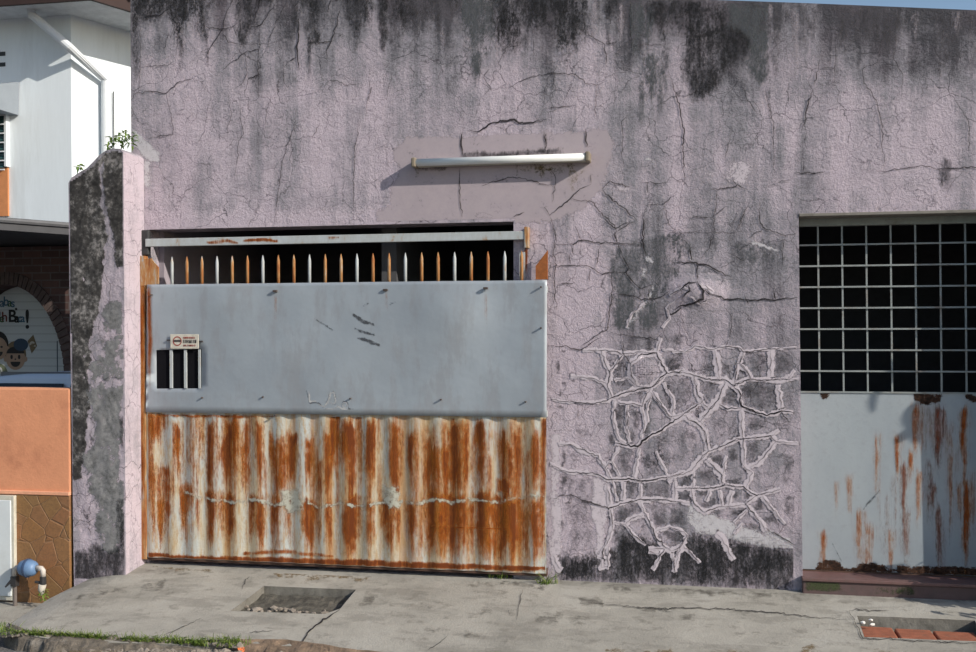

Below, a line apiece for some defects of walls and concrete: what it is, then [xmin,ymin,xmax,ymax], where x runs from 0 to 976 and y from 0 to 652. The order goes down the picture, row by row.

damp [630,0,788,120]
crack [862,40,976,172]
rust [140,286,152,401]
crack [459,4,797,571]
damp [75,500,125,579]
rust [141,413,546,572]
peeling [185,433,563,574]
peeling [591,477,609,572]
damp [558,482,793,589]
peeling [687,504,793,552]
rust [815,438,976,575]
crack [303,609,340,641]